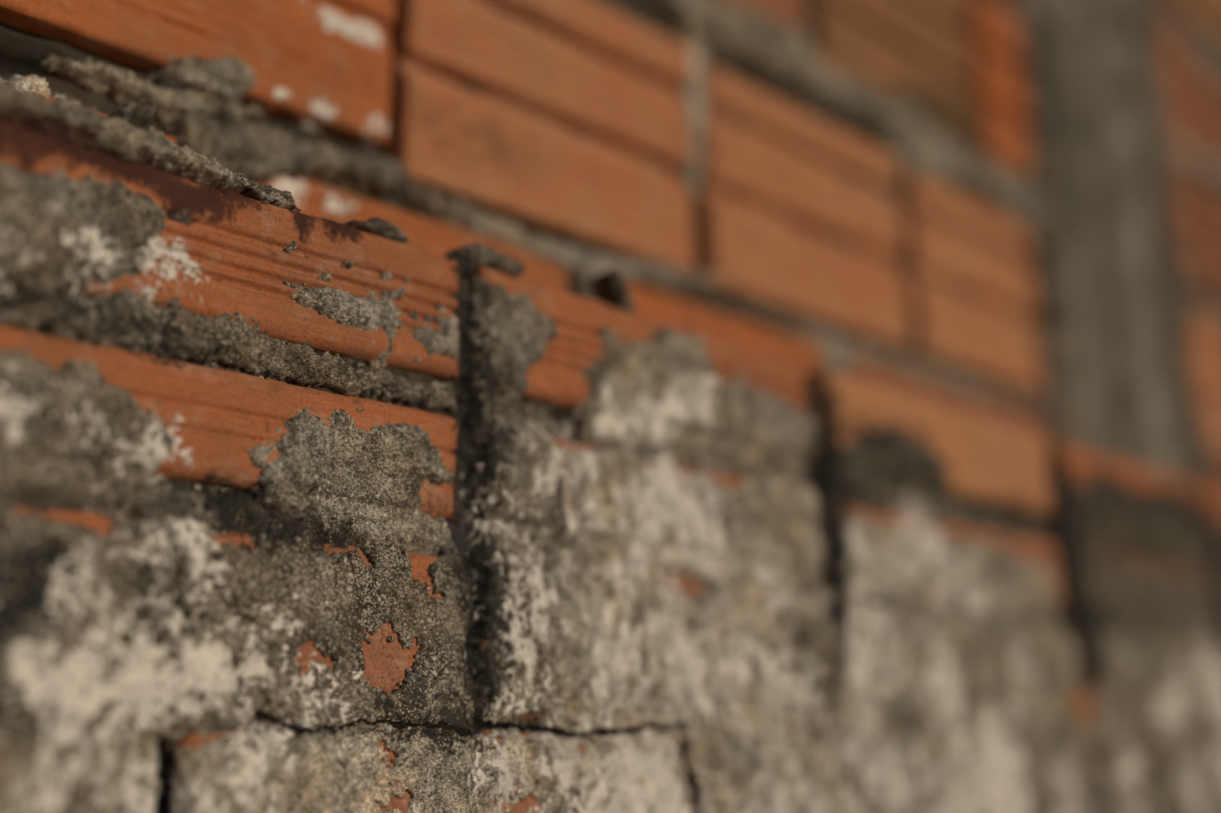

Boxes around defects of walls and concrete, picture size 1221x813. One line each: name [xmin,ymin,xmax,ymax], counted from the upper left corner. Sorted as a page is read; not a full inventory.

flaking render [0,163,194,302]
water stain [0,106,260,370]
water stain [289,205,362,242]
water stain [0,247,1090,813]
flaking render [0,260,1221,813]
water stain [1038,437,1106,693]
crack [155,736,173,813]
crack [253,709,719,813]